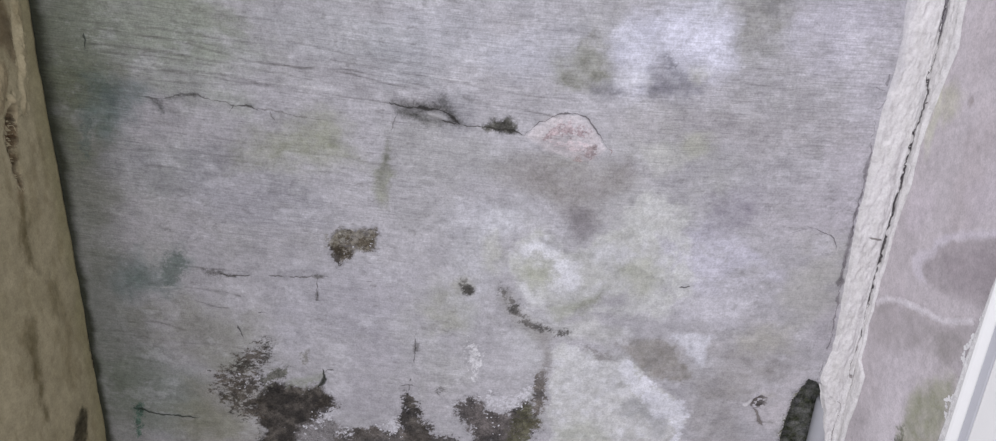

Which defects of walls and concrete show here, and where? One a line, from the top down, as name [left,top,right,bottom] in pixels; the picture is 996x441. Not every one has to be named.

crack [146,91,257,116]
crack [386,89,522,137]
crack [831,0,949,440]
spalling [322,222,381,269]
crack [200,267,328,302]
water stain [166,151,800,441]